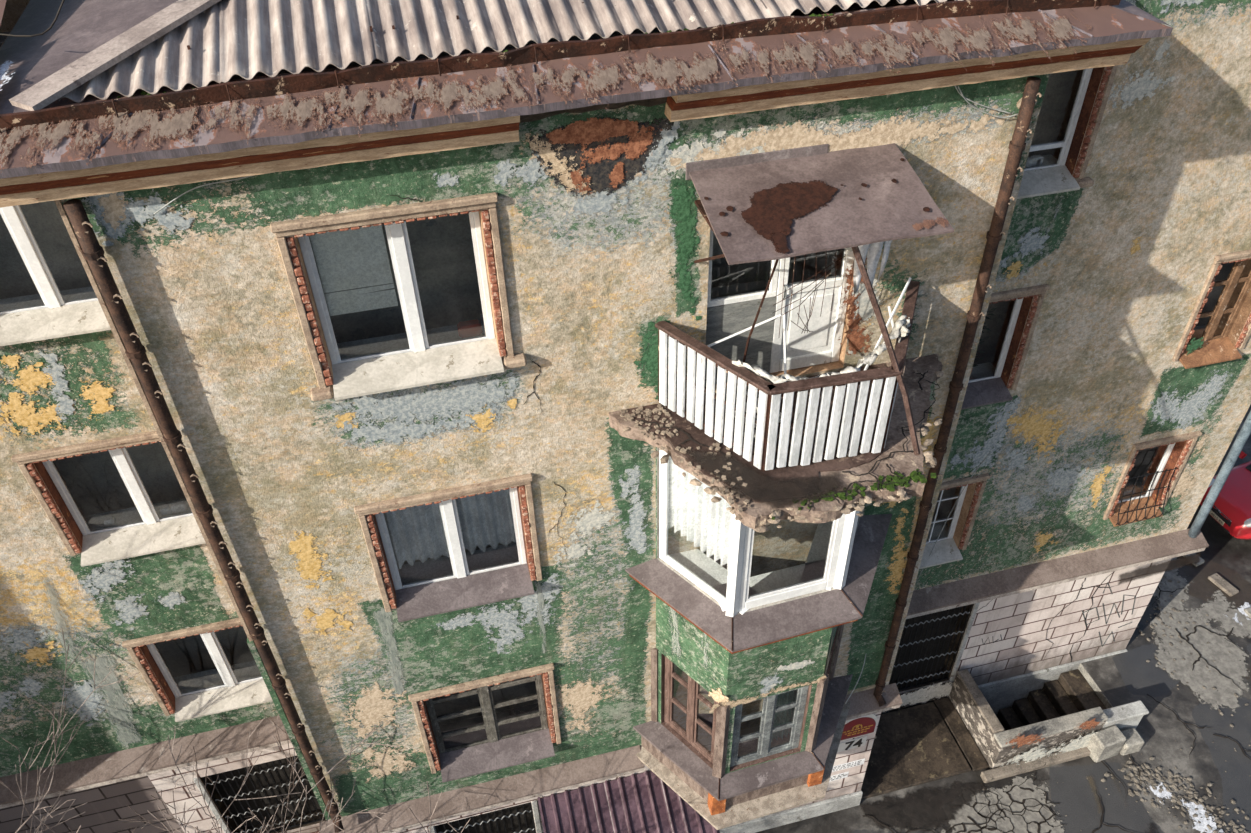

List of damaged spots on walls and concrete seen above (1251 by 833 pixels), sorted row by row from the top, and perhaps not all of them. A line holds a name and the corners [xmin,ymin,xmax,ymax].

flaking render [491,105,1005,321]
corrosion [719,180,843,254]
peeling [0,348,119,438]
peeling [912,395,1112,515]
peeling [1145,369,1232,503]
peeling [72,558,188,630]
peeling [431,443,679,654]
spalling [754,489,913,594]
peeling [340,675,426,784]
peeling [556,675,614,735]
crack [863,771,1063,833]
crack [1092,754,1146,833]